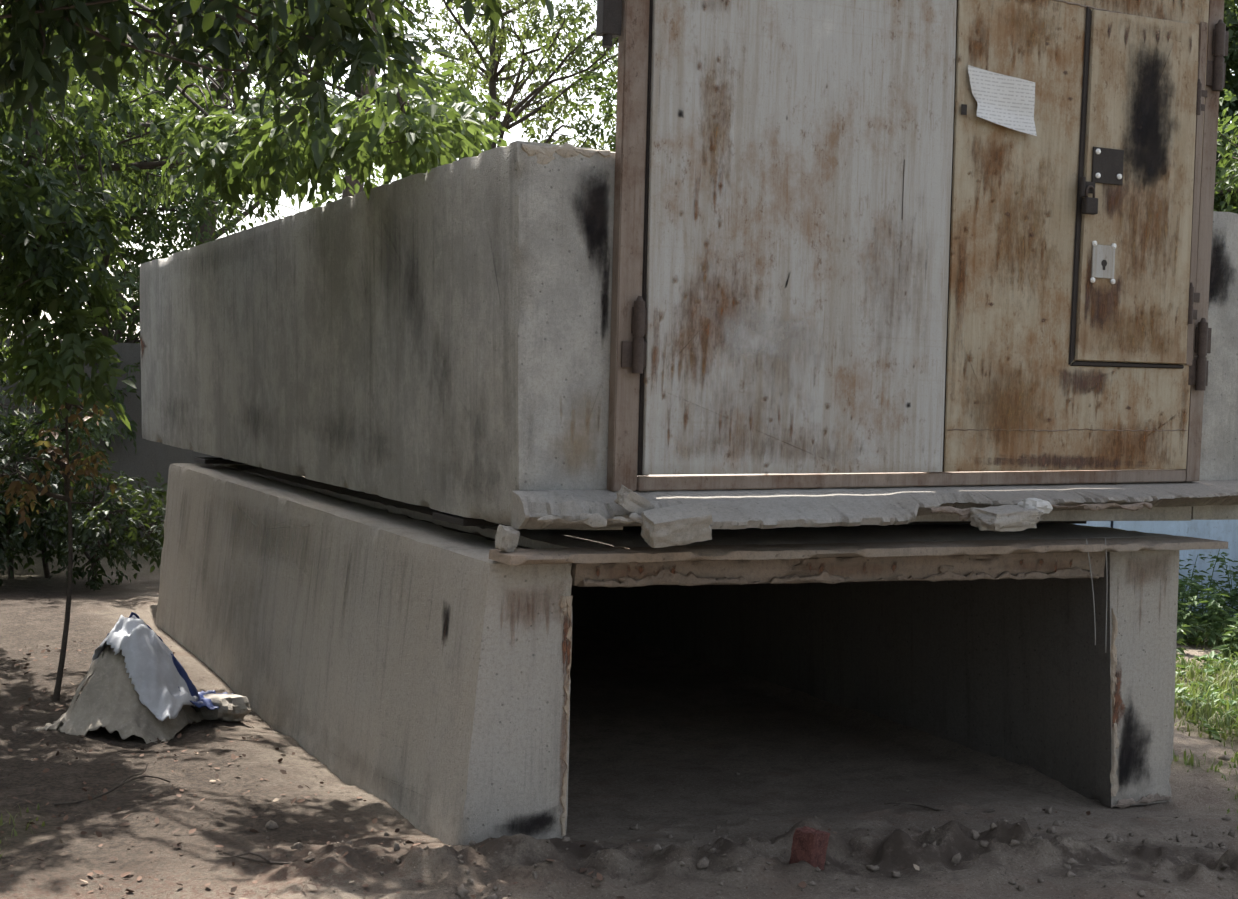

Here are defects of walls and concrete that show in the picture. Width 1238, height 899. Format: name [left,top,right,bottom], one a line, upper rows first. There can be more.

rust [1102,0,1184,44]
leakage [1137,57,1165,185]
rust [1104,184,1177,273]
rust [645,266,751,398]
rust [1085,261,1164,349]
rust [1063,368,1119,416]
rust [995,414,1167,469]